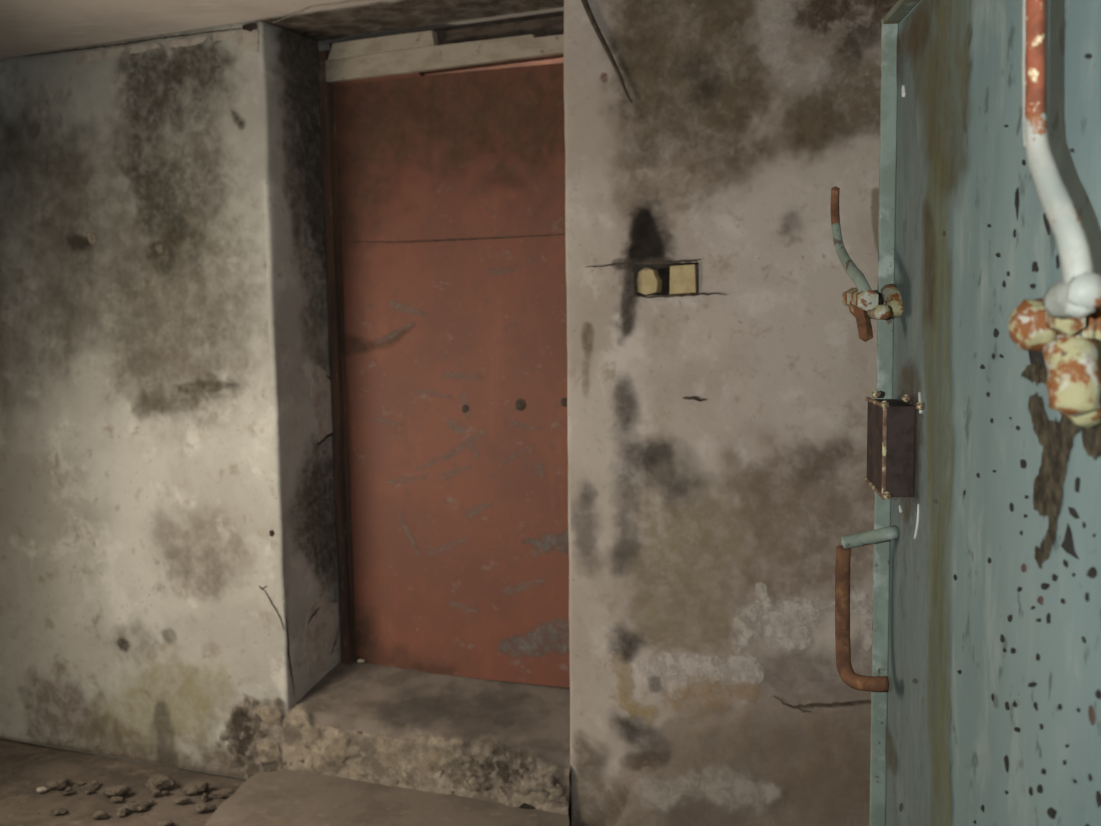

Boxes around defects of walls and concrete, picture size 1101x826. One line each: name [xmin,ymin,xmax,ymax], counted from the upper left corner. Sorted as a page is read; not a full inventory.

leakage [759,0,898,91]
crack [587,260,630,268]
leakage [613,210,665,332]
leakage [636,583,835,701]
leakage [850,588,873,651]
spalling [217,695,361,780]
crack [774,696,871,712]
leakage [627,754,780,811]